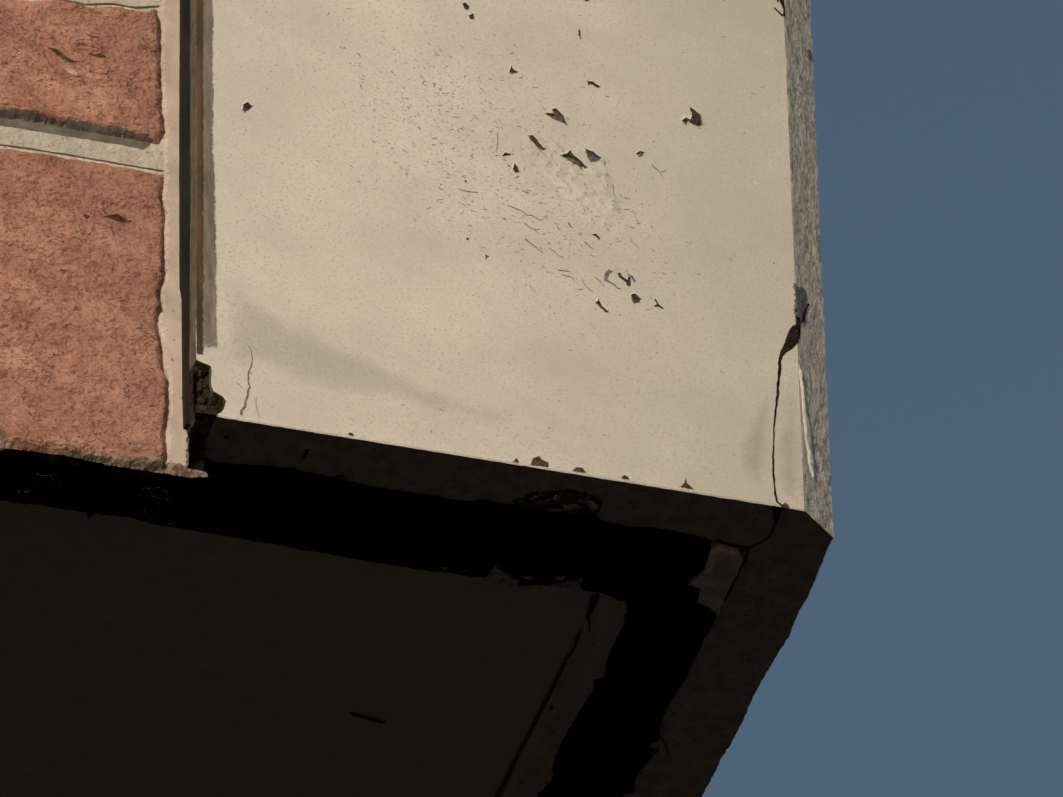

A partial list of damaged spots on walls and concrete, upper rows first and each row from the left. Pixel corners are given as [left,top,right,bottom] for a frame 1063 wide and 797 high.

peeling [545,107,567,125]
peeling [681,106,704,126]
peeling [529,134,545,150]
peeling [561,147,601,168]
peeling [630,292,663,309]
spalling [0,429,22,451]
crack [716,294,809,608]
peeling [511,490,603,514]